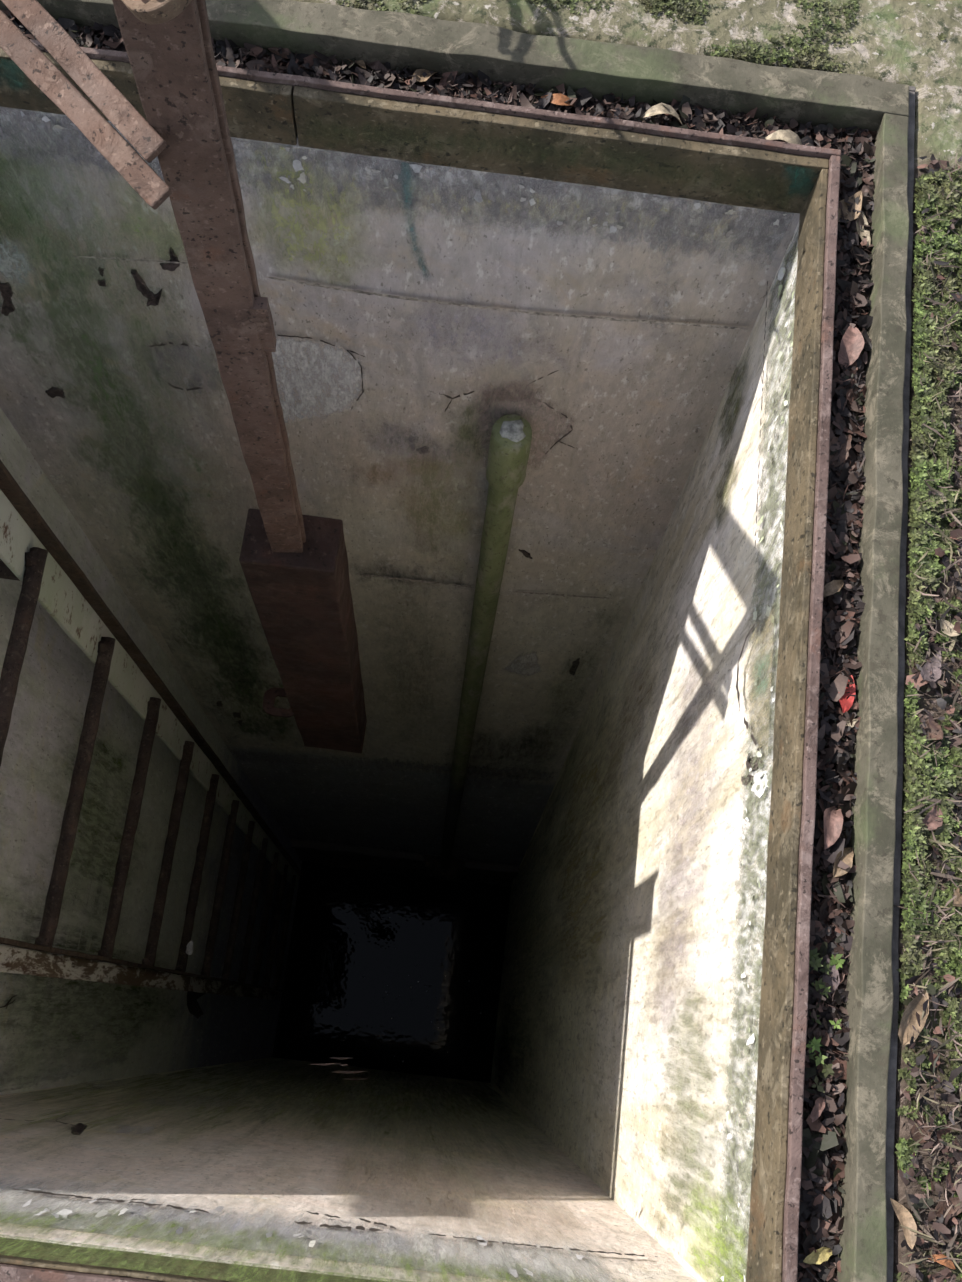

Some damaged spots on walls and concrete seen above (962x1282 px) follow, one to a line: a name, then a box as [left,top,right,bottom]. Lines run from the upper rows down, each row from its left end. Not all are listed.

peeling [160,246,180,271]
peeling [0,248,29,316]
peeling [131,269,162,307]